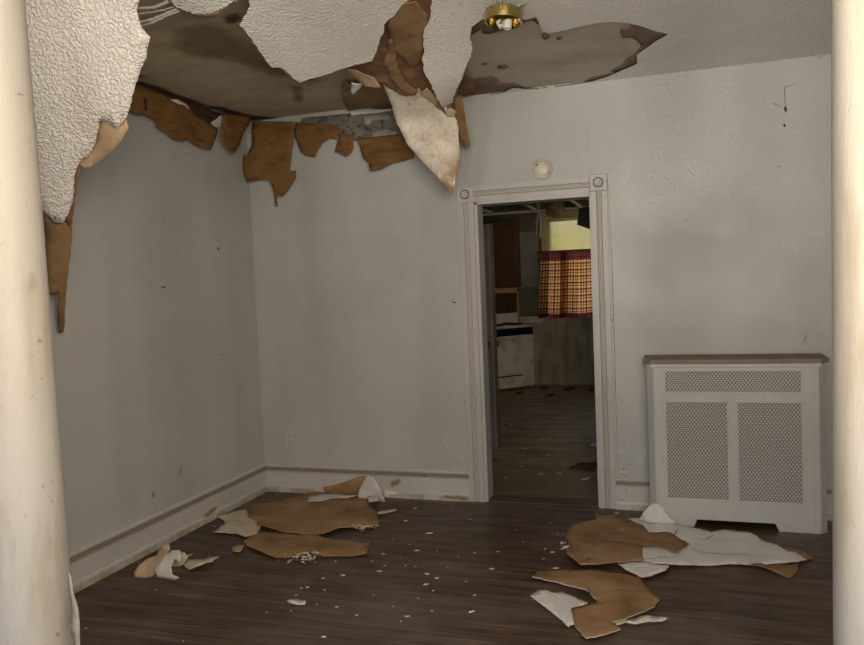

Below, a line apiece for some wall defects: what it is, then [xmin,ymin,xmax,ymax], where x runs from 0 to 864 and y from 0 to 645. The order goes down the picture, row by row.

flaking render [129,0,414,207]
peeling [454,17,666,96]